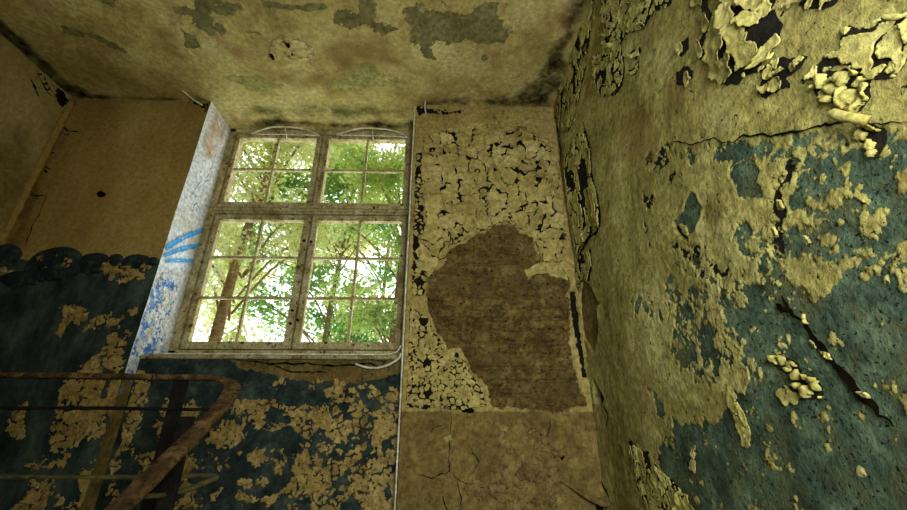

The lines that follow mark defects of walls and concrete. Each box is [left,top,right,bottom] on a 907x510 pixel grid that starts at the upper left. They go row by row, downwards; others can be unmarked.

leakage [0,21,107,99]
peeling [261,0,514,62]
leakage [487,0,587,105]
peeling [674,0,907,99]
crack [667,121,843,146]
crack [868,119,907,127]
flaking render [411,0,672,412]
peeling [10,260,188,510]
crack [248,360,379,373]
crack [405,307,487,510]
peeling [631,130,907,510]
crack [776,296,894,427]